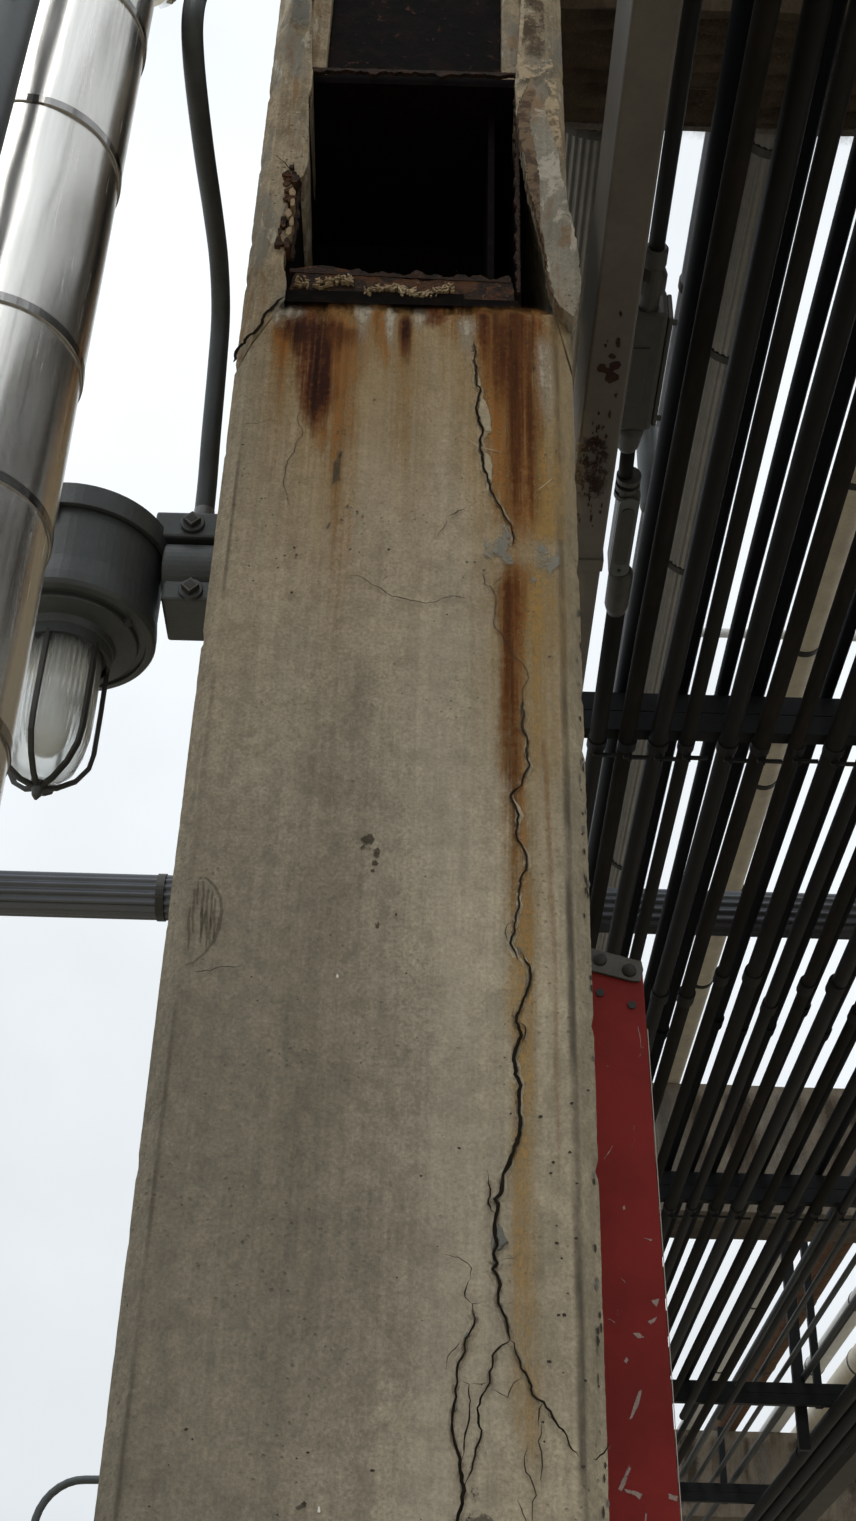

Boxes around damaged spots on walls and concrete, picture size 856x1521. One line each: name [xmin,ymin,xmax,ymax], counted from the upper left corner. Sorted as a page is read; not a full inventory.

spalling [274,0,562,319]
crack [233,296,285,362]
corrosion [272,309,621,542]
crack [348,341,609,1521]
corrosion [493,561,556,1336]